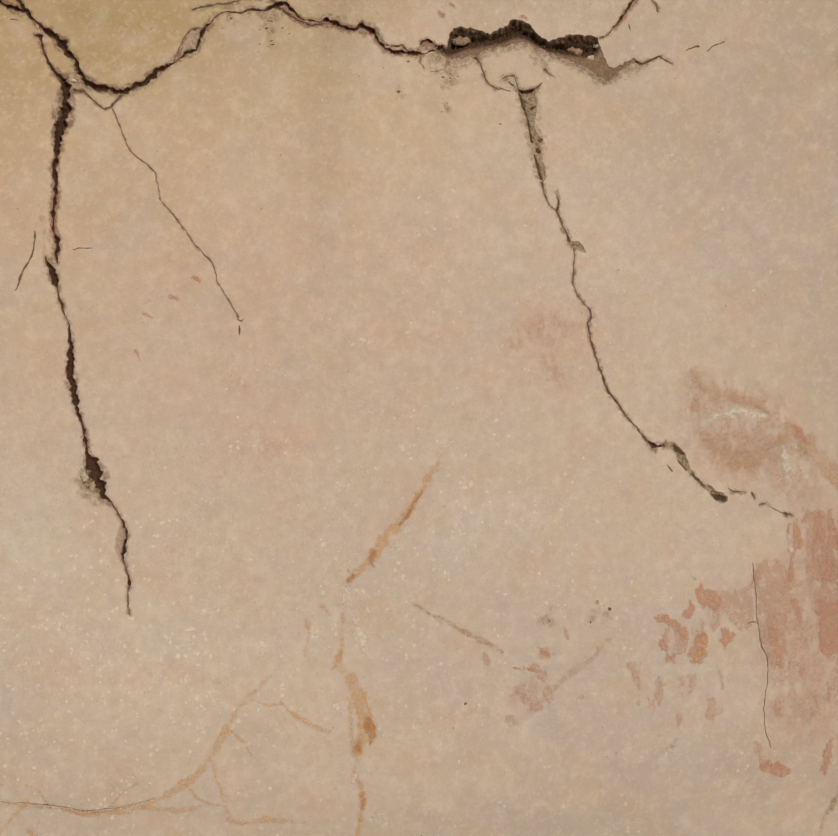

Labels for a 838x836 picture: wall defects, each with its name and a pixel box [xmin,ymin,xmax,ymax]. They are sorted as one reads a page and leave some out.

crack [0,0,792,615]
rust [333,693,376,755]
crack [747,563,771,748]